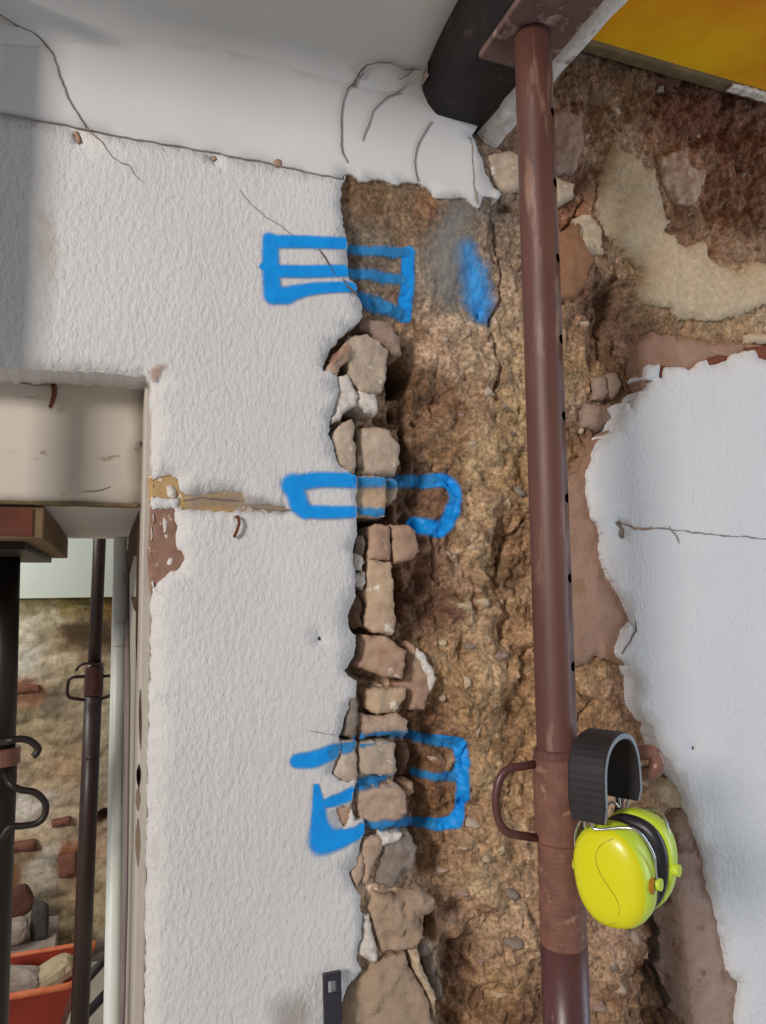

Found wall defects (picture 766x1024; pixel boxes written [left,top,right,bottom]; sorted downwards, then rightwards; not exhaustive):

crack [0,14,423,182]
crack [414,123,431,181]
crack [239,189,293,235]
crack [319,249,358,296]
flaking render [553,51,766,744]
flaking render [147,475,292,593]
flaking render [323,124,543,1024]
crack [620,523,766,543]
flaking render [586,773,737,1024]